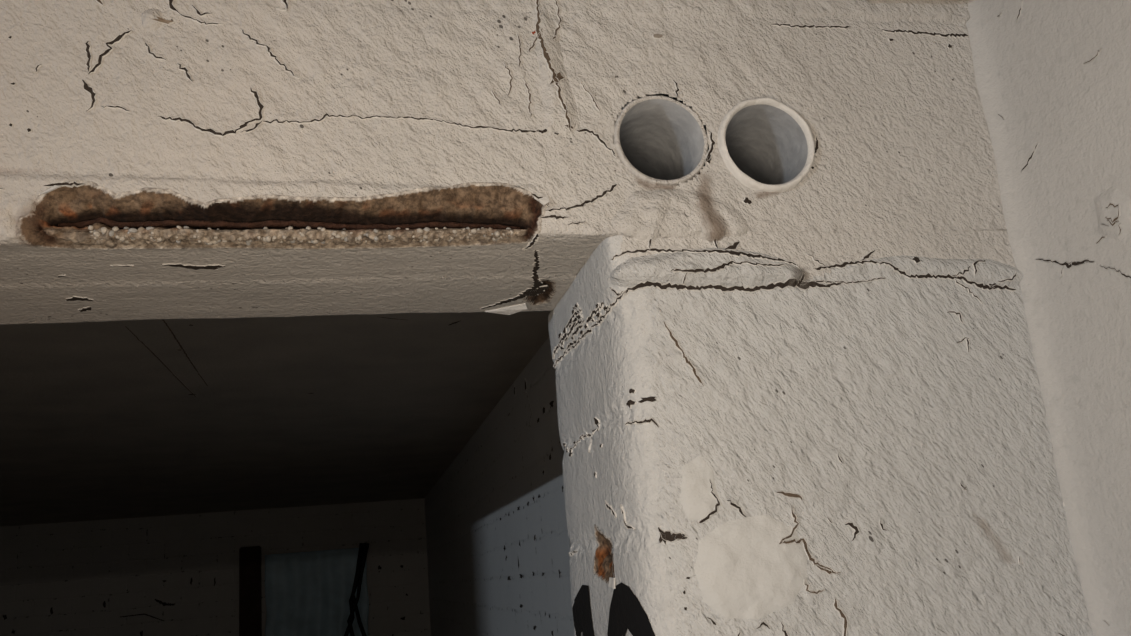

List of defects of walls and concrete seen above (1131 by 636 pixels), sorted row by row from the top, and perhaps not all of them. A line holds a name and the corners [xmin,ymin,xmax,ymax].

crack [82,30,193,112]
crack [44,180,84,188]
spalling [14,180,550,250]
crack [157,0,617,325]
crack [609,202,1131,352]
crack [663,321,704,386]
crack [699,479,746,524]
crack [777,491,848,636]
crack [827,517,887,541]
crack [683,577,789,636]